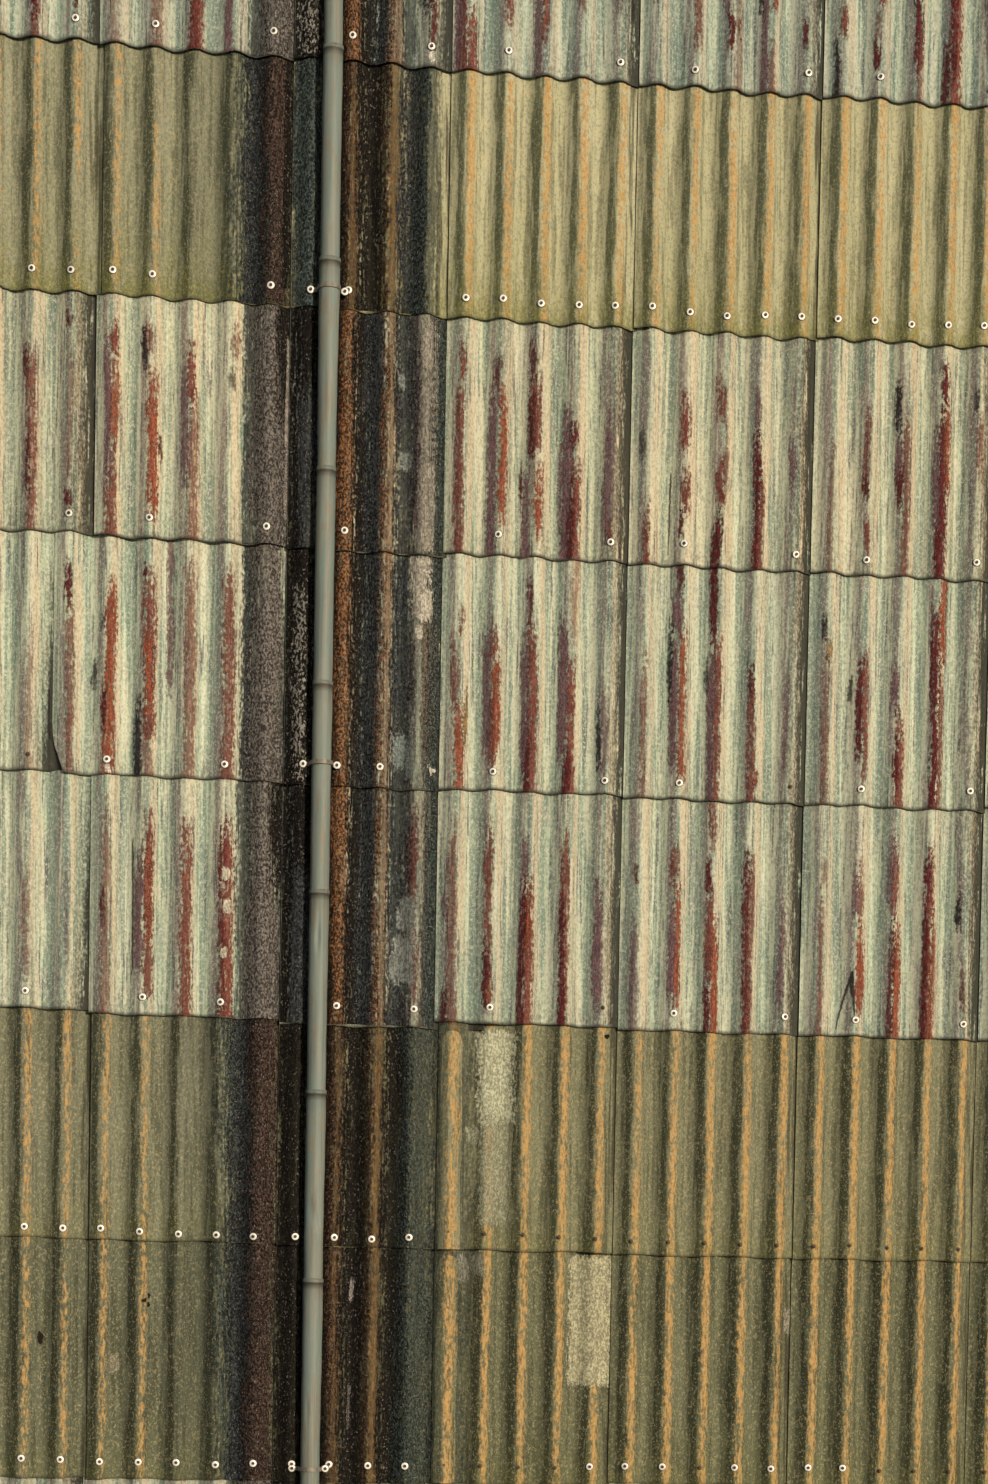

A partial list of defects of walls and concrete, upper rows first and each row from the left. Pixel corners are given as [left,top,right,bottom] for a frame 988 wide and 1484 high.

corrosion [913,0,925,100]
corrosion [940,0,964,105]
corrosion [63,317,199,778]
damp [212,0,324,1484]
damp [319,0,447,1484]
corrosion [449,608,501,788]
corrosion [518,577,576,793]
corrosion [666,377,729,1032]
corrosion [927,363,951,809]
corrosion [215,814,235,1018]
corrosion [884,837,901,1038]
corrosion [918,843,936,1039]